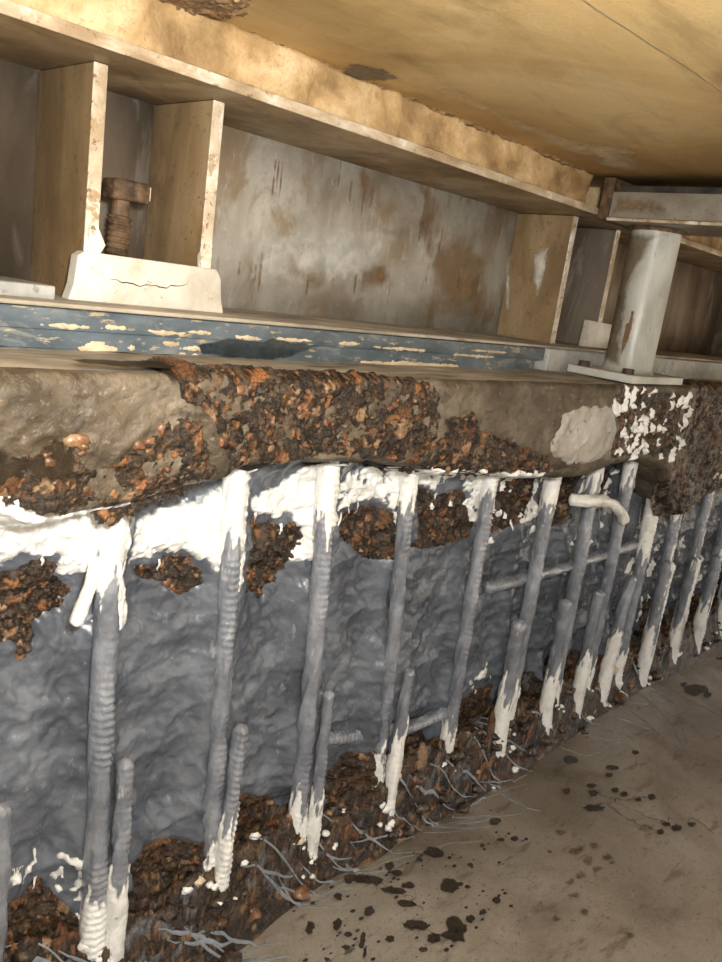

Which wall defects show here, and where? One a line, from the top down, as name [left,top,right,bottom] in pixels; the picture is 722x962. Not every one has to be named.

crack [108,278,186,289]
corrosion [354,268,390,293]
corrosion [419,191,483,302]
corrosion [606,236,649,362]
leakage [0,446,74,486]
spalling [0,329,586,533]
spalling [610,379,722,518]
spalling [246,516,303,599]
spalling [338,505,396,560]
spalling [410,486,474,549]
spalling [0,558,71,661]
spalling [324,750,378,803]